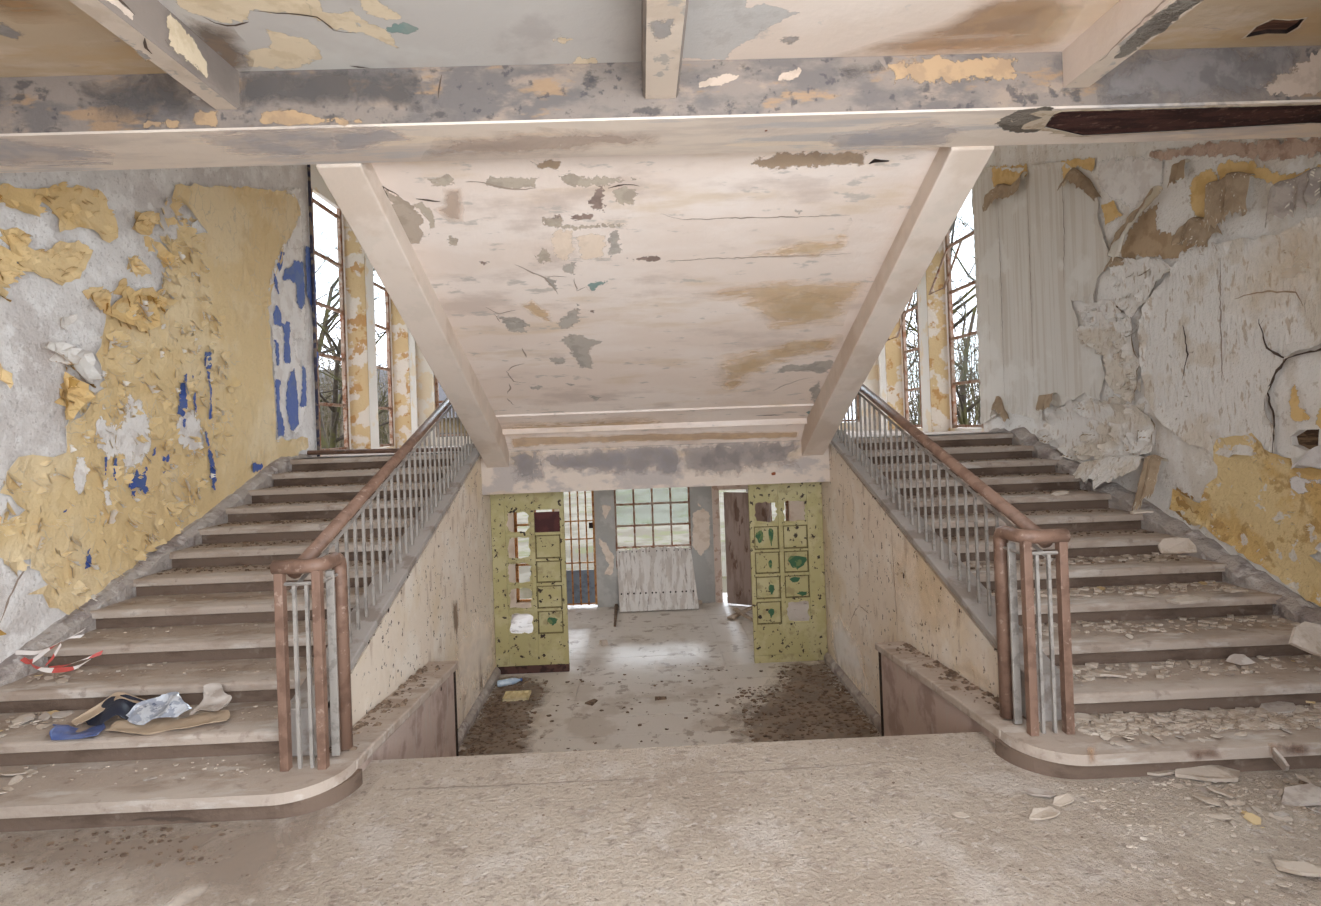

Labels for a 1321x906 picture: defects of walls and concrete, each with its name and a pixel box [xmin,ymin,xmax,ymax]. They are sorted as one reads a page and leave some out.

peeling [106,0,134,20]
peeling [167,0,419,78]
peeling [648,0,802,88]
leakage [894,0,1065,51]
flaking render [1114,0,1203,58]
peeling [143,109,404,154]
peeling [972,49,1321,607]
crack [1181,327,1189,378]
crack [1219,262,1321,453]
peeling [0,182,319,615]
flaking render [1226,654,1272,665]
flaking render [1288,621,1321,657]